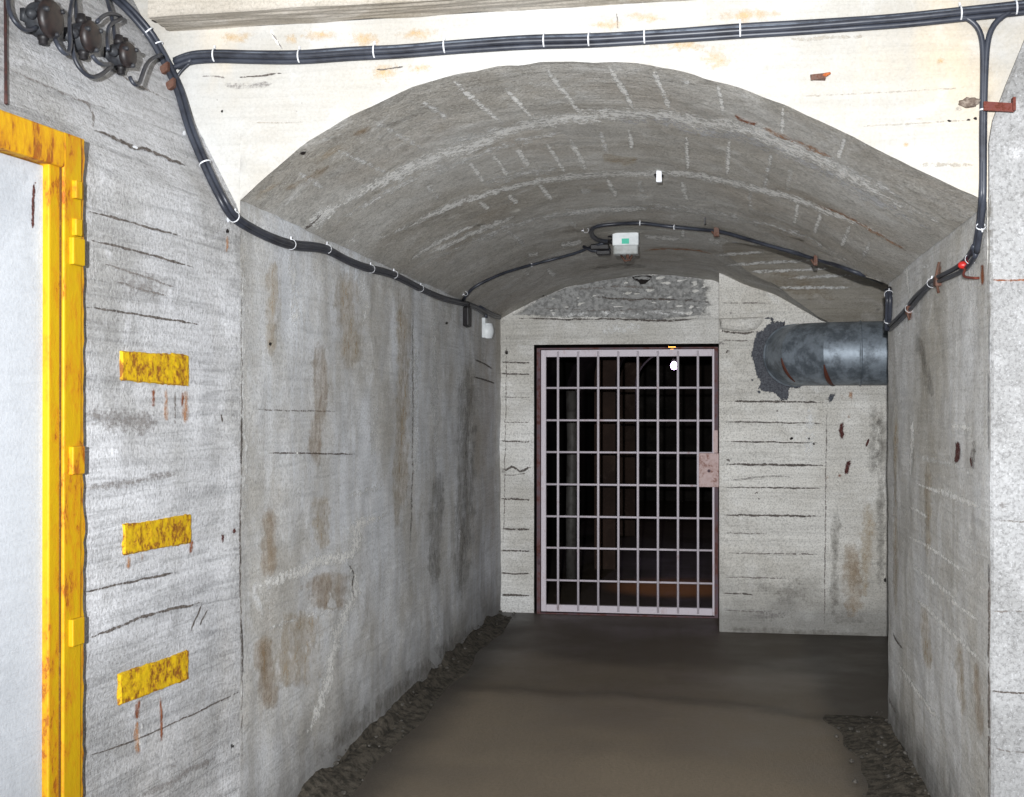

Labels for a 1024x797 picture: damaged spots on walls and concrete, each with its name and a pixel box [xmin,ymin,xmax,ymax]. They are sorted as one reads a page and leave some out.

corrosion [152,390,187,423]
corrosion [954,442,974,467]
crack [86,251,354,755]
corrosion [134,701,143,751]